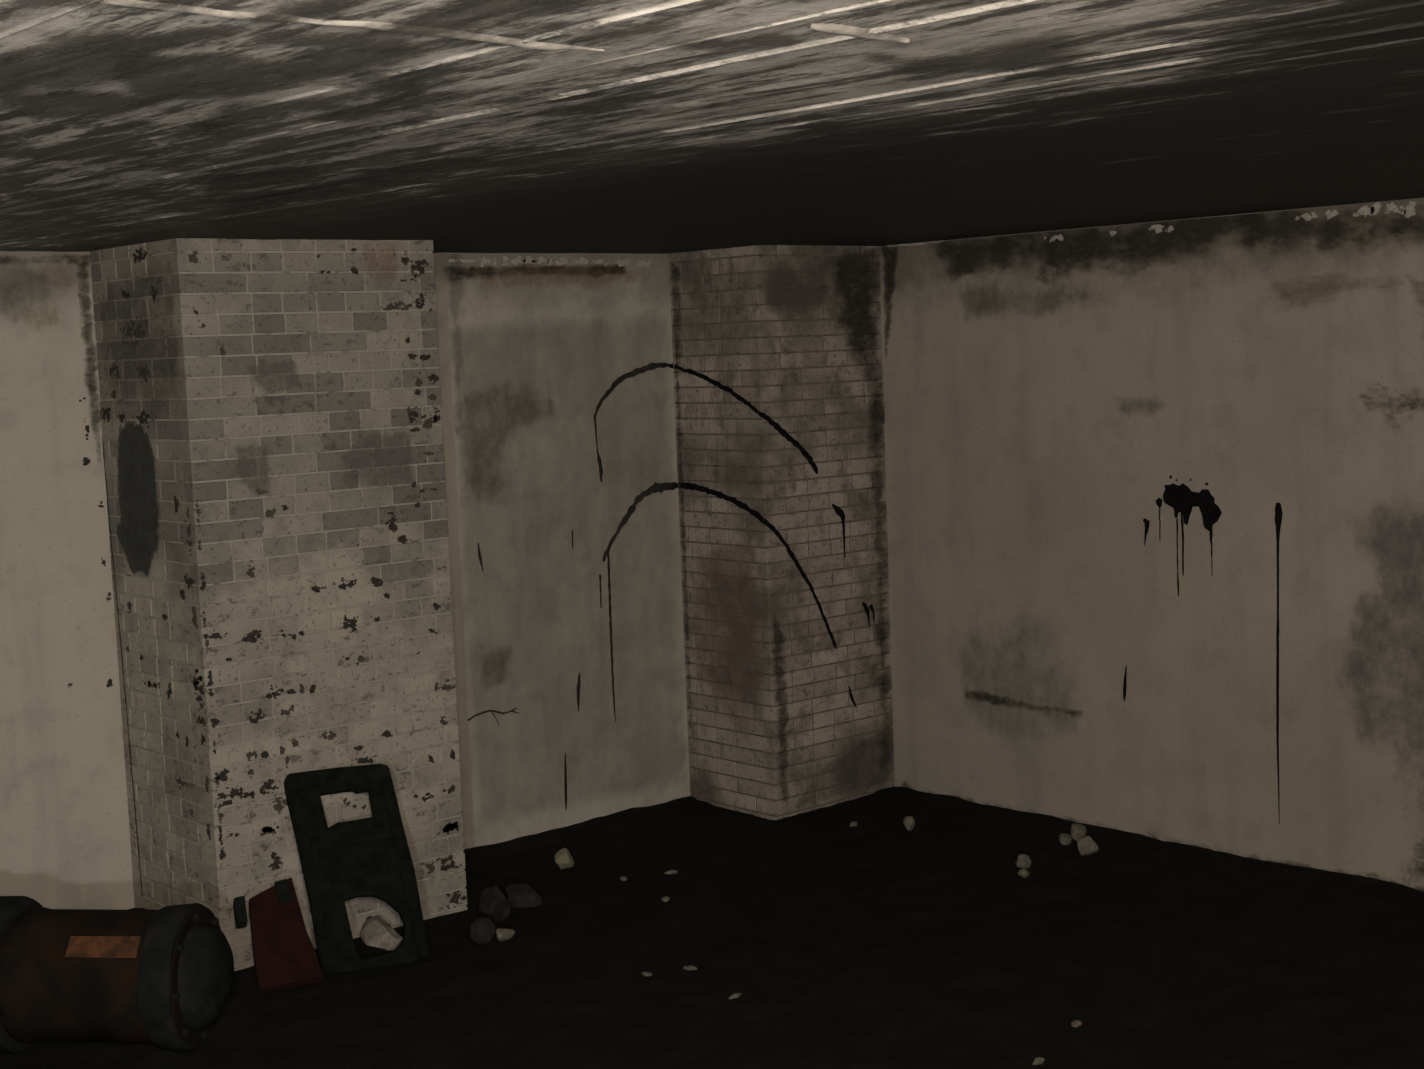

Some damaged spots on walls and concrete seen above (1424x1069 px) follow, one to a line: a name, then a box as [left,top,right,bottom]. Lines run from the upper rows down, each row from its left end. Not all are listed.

water stain [593,267,818,482]
water stain [117,420,159,576]
water stain [603,463,837,649]
water stain [772,624,788,793]